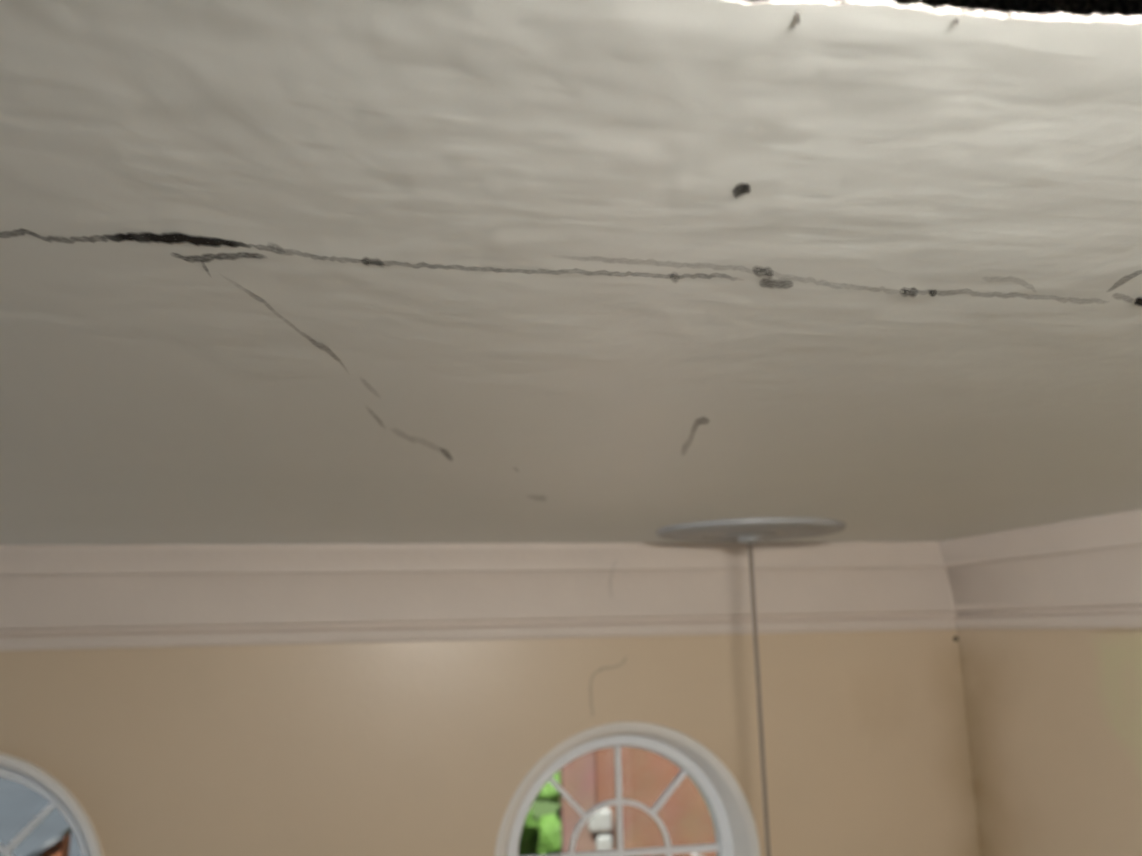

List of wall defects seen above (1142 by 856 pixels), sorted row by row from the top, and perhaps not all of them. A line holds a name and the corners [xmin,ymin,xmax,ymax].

crack [730,0,1142,24]
crack [0,229,259,262]
crack [362,258,382,266]
crack [755,268,786,287]
crack [902,288,936,296]